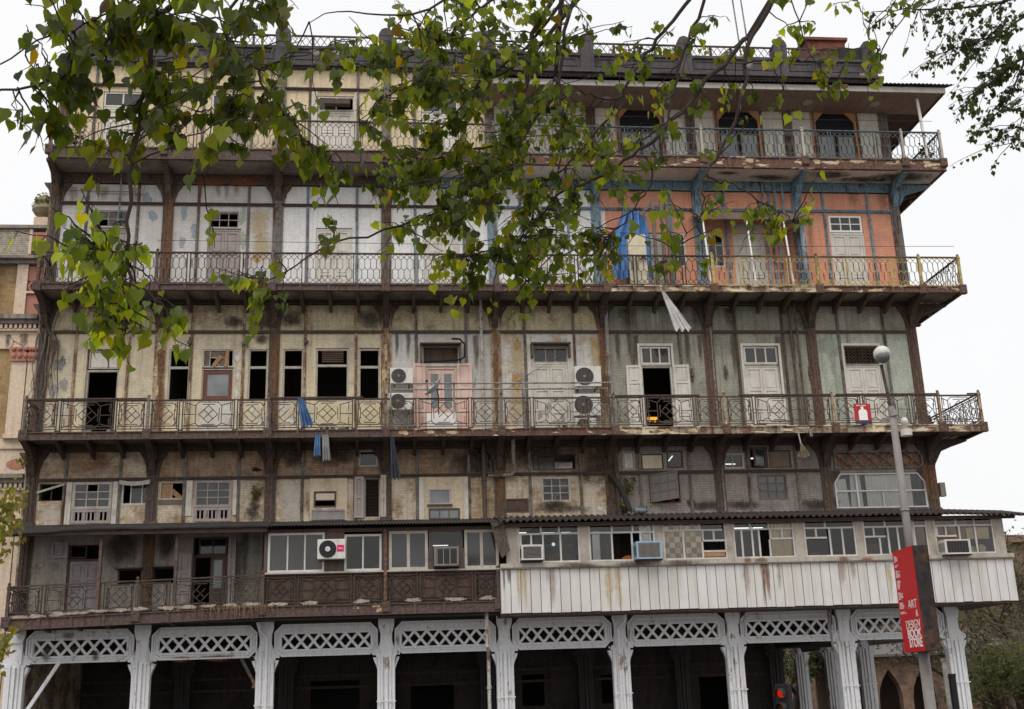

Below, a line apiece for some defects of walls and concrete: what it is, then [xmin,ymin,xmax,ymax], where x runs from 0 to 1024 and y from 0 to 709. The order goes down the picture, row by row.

corrosion [745,558,770,594]
flaking render [10,601,319,619]